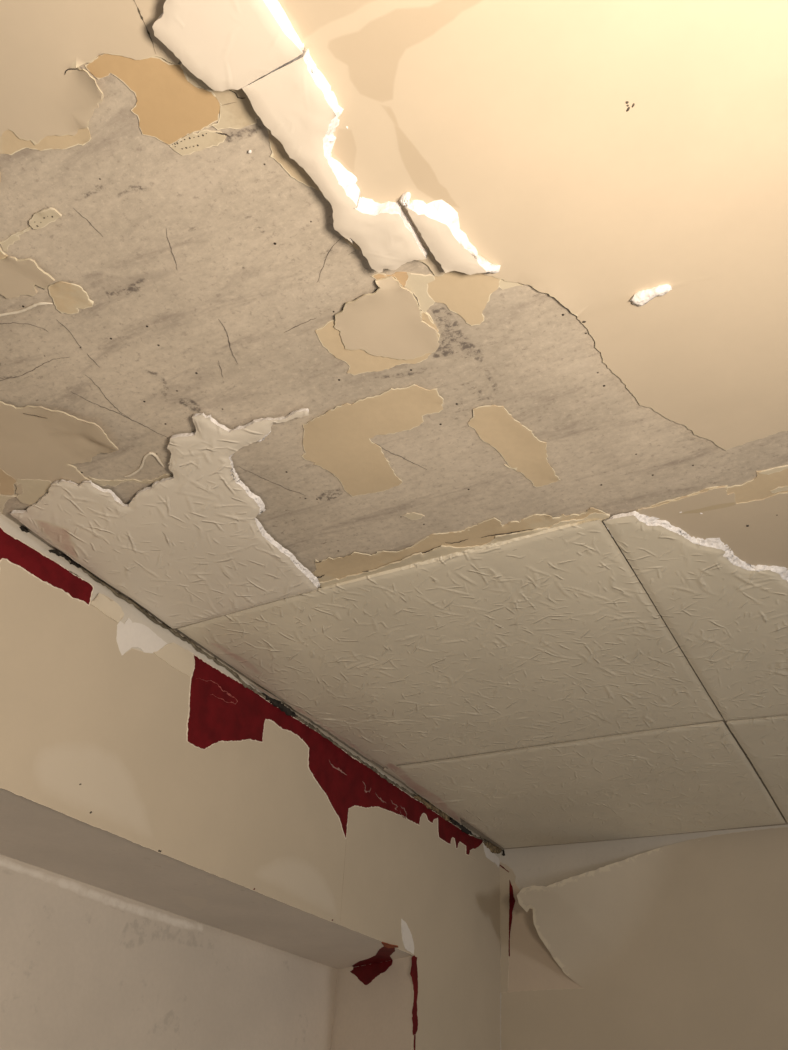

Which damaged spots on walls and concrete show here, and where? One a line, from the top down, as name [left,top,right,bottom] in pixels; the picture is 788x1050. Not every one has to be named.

peeling [29,207,62,229]
peeling [277,0,788,451]
peeling [48,281,94,314]
peeling [0,401,173,515]
peeling [468,405,561,487]
peeling [312,507,610,588]
peeling [636,466,788,571]
peeling [410,955,418,1050]